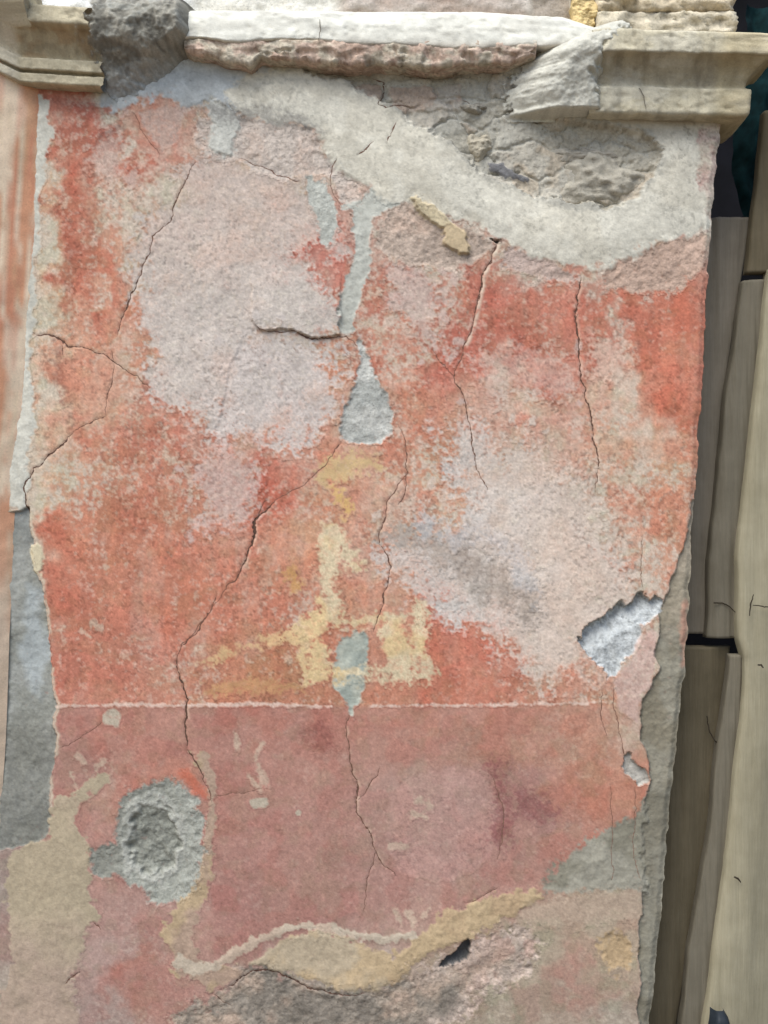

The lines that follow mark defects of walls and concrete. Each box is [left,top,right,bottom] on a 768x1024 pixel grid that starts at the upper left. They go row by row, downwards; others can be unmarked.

flaking render [301,68,664,211]
peeling [28,540,51,578]
crack [23,164,194,512]
crack [176,445,339,802]
crack [258,327,357,346]
crack [373,425,408,632]
crack [434,246,497,489]
peeling [366,192,664,698]
crack [574,280,600,487]
flaking render [600,233,709,300]
crack [346,715,394,911]
spalling [438,938,472,969]